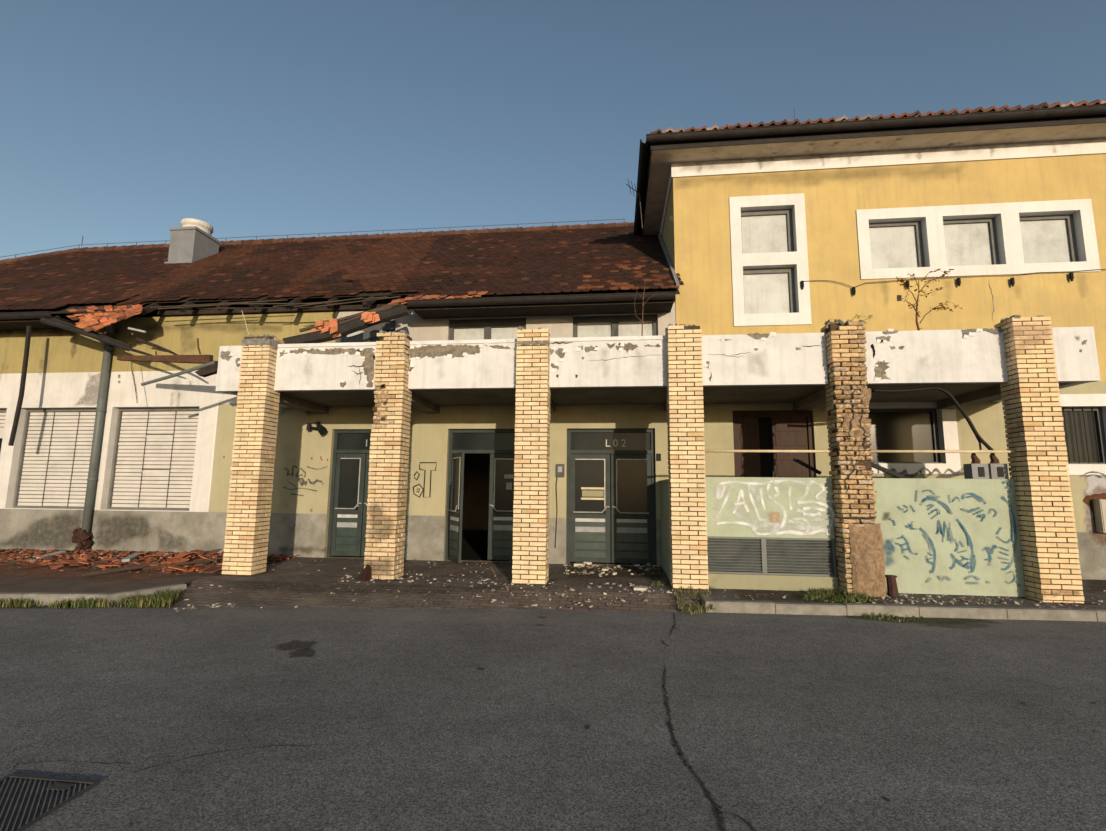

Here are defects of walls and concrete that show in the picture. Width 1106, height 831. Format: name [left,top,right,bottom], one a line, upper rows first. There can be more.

spalling [379,330,511,374]
spalling [550,324,696,377]
spalling [838,329,905,440]
spalling [1083,492,1106,542]
crack [662,613,755,831]